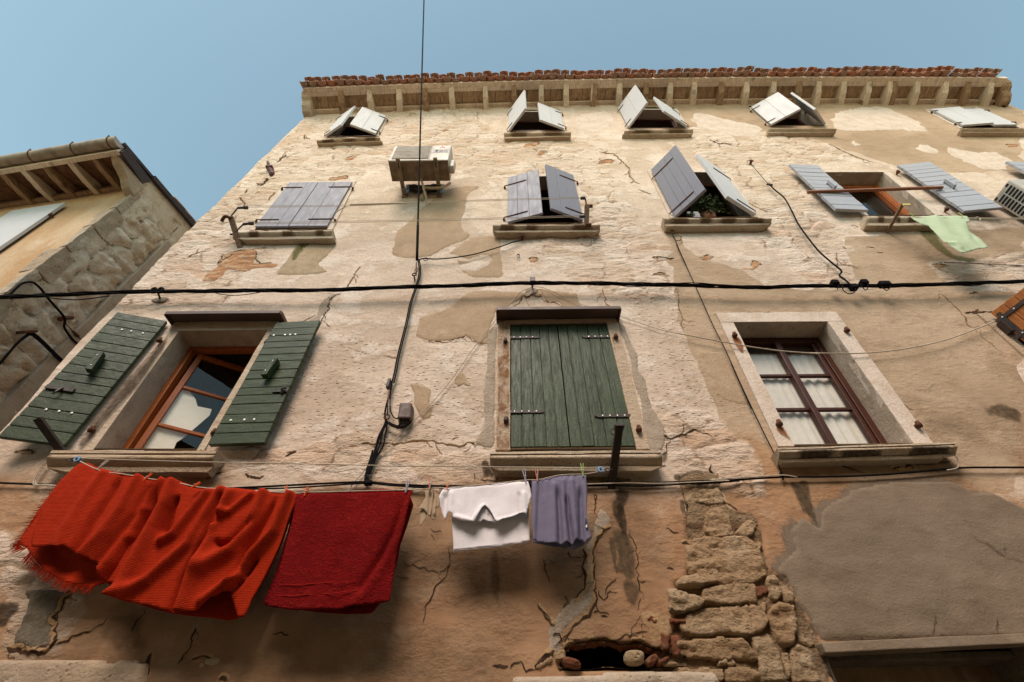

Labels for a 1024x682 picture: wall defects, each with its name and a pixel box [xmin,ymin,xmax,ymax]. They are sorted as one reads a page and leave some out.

peeling [830,106,928,146]
spalling [202,249,278,282]
peeling [392,186,582,344]
crack [397,528,458,621]
crack [493,494,647,672]
damp [610,489,638,604]
flaking render [536,473,829,682]
damp [792,481,817,524]